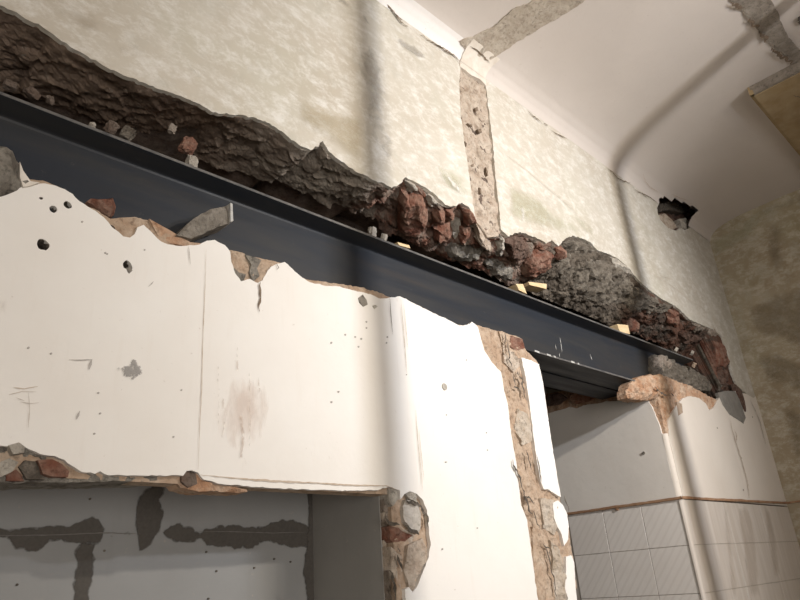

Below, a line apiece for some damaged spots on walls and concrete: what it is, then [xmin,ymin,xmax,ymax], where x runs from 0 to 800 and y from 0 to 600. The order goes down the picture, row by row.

spalling [0,9,734,436]
spalling [0,442,157,491]
spalling [166,471,247,496]
spalling [476,325,577,600]
spalling [379,488,429,600]